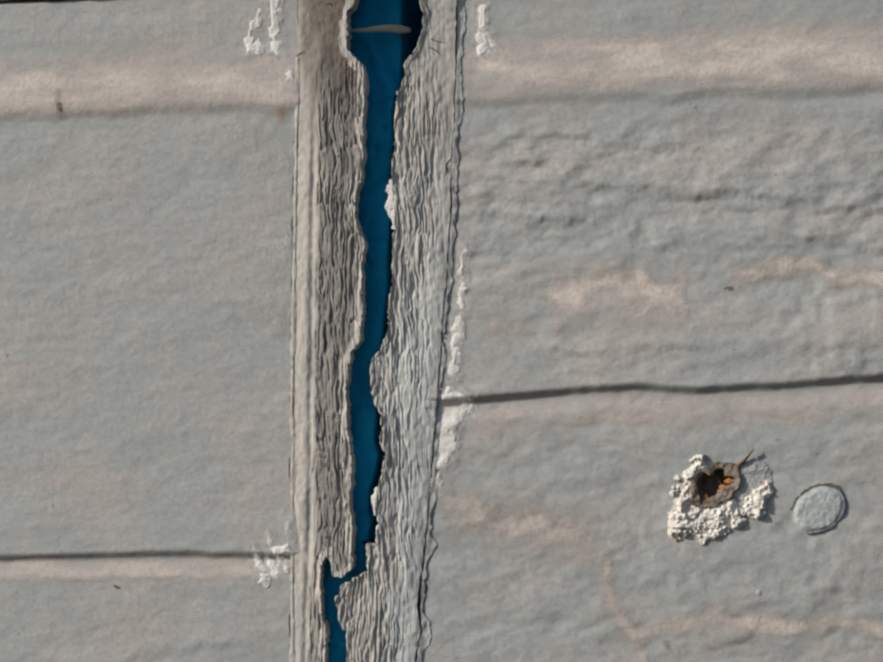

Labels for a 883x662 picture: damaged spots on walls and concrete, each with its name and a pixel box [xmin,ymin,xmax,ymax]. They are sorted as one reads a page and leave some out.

crack [315,0,466,662]
spalling [688,451,772,507]